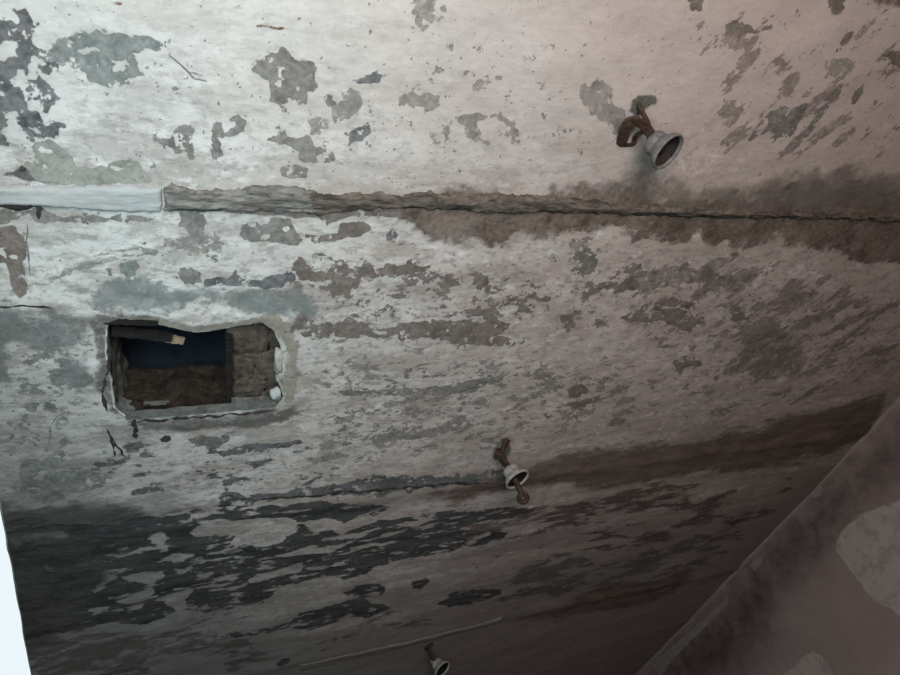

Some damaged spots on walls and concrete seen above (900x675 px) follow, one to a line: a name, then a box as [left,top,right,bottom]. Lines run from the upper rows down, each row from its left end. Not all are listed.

peeling [0,8,170,186]
peeling [252,47,317,113]
peeling [700,9,888,161]
crack [391,206,485,214]
flaking render [48,66,900,282]
water stain [399,166,900,264]
crack [538,210,797,219]
crack [225,481,504,501]
peeling [2,229,900,675]
water stain [433,476,506,500]
water stain [521,394,885,490]
water stain [1,504,145,654]